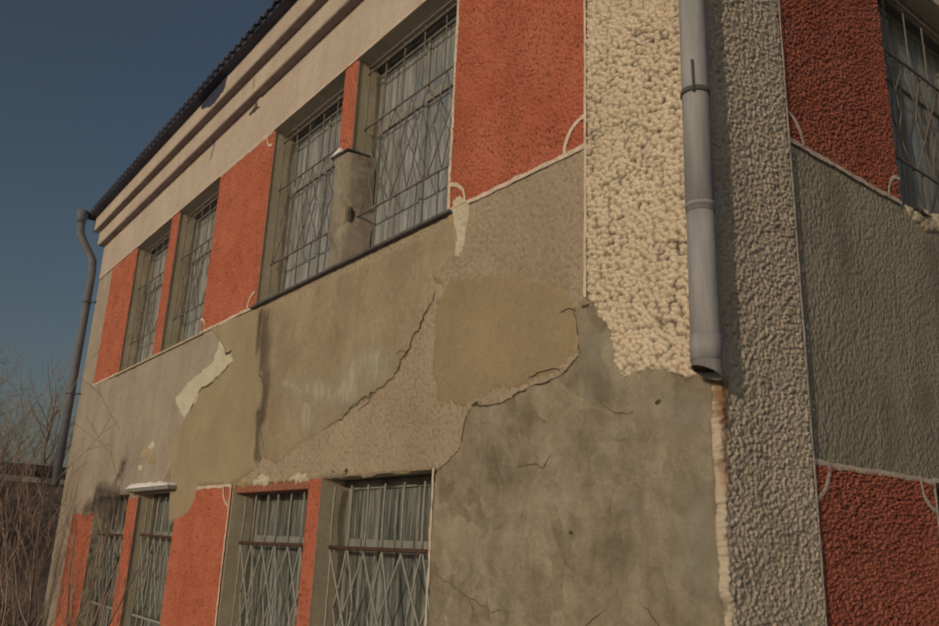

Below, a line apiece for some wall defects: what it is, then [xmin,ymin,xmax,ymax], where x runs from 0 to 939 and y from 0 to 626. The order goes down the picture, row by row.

peeling [175,341,233,418]
water stain [255,312,268,460]
crack [327,284,438,428]
crack [439,308,579,469]
corrosion [715,380,728,468]